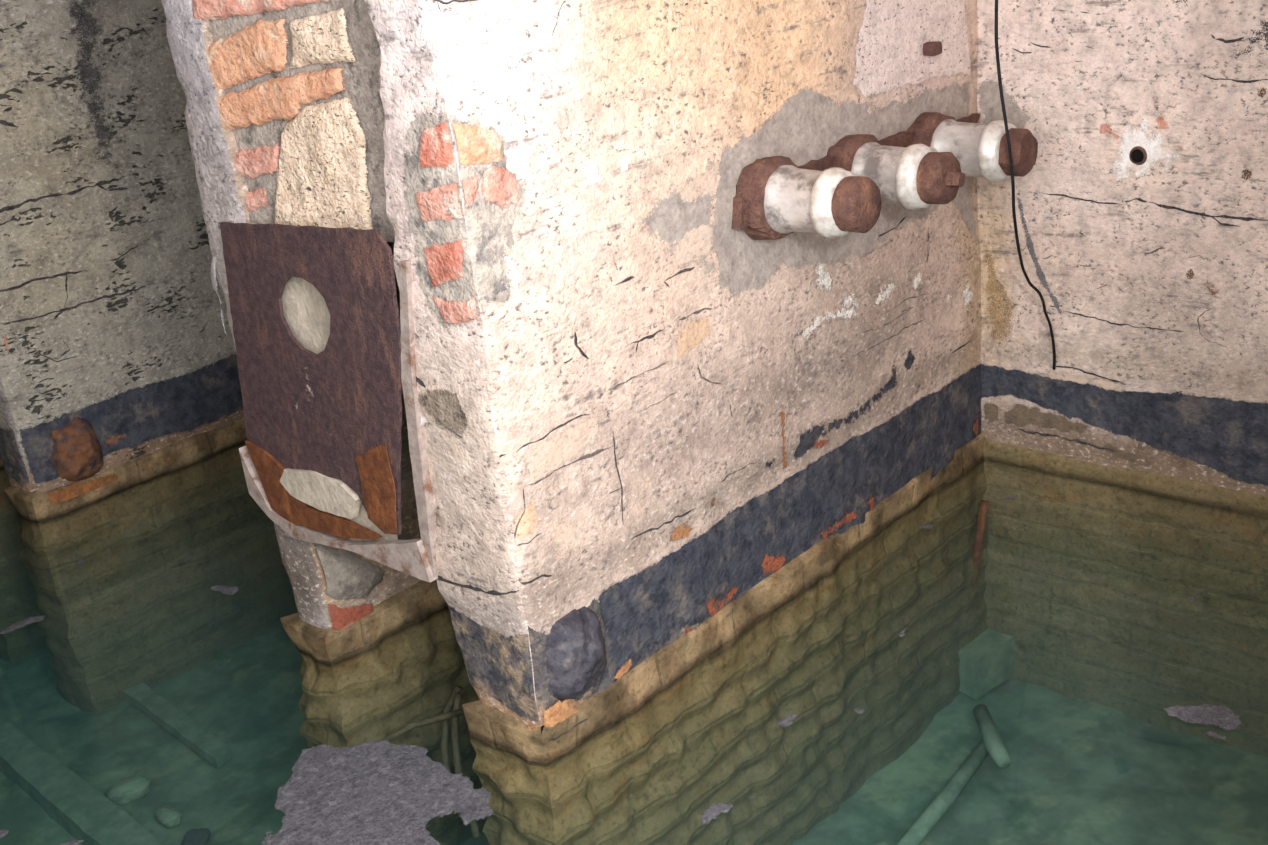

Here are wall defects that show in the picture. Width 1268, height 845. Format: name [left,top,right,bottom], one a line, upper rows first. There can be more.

crack [1202,35,1268,83]
spalling [192,0,373,230]
crack [0,175,137,213]
spalling [402,110,526,332]
crack [1039,192,1268,260]
crack [0,245,154,362]
flaking render [210,256,226,334]
crack [611,308,732,416]
water stain [793,350,915,460]
corrosion [245,440,397,540]
crack [514,433,696,546]
crack [437,574,552,596]